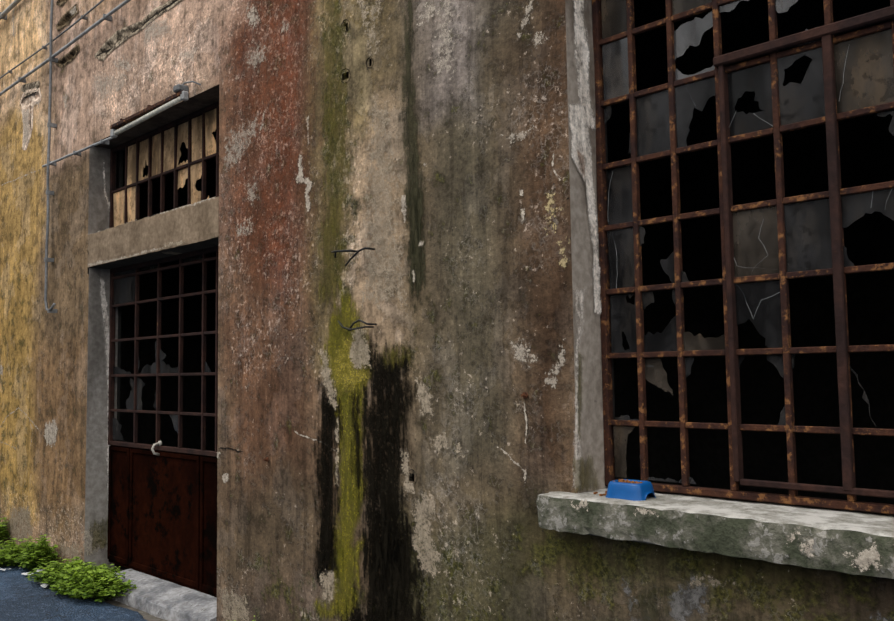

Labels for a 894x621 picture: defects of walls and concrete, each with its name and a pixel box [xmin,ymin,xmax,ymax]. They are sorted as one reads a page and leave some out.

flaking render [56,0,78,31]
flaking render [56,44,80,68]
flaking render [20,81,41,150]
peeling [569,0,601,314]
peeling [512,344,538,362]
peeling [545,339,565,388]
peeling [573,291,583,488]
water stain [313,335,430,621]
spalling [786,531,814,557]
spalling [843,542,882,572]